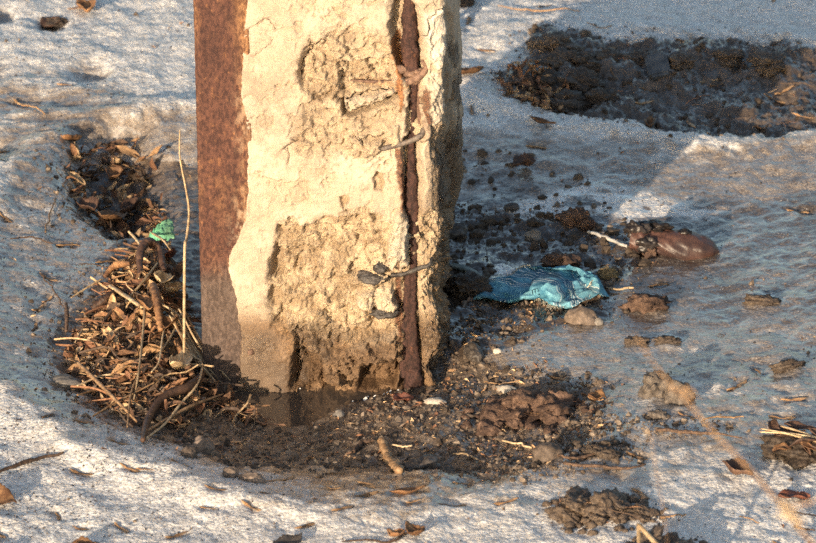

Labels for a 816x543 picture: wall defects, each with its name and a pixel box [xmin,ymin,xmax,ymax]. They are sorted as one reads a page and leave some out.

rust [390,30,404,113]
rust [420,88,432,125]
spalling [268,0,458,393]
rust [395,149,405,213]
rust [393,260,403,341]